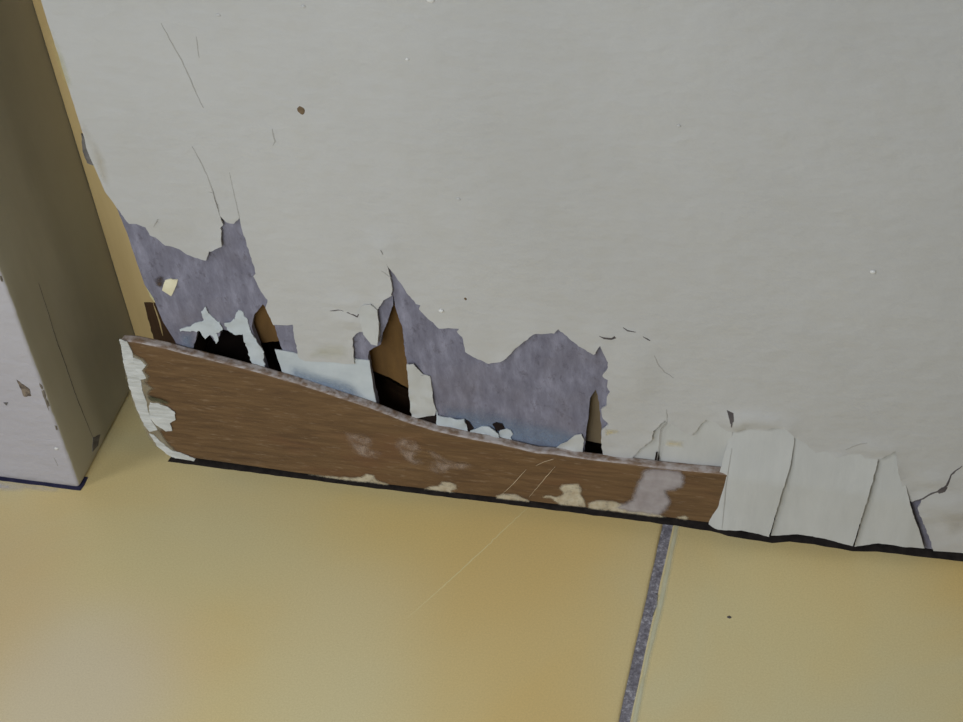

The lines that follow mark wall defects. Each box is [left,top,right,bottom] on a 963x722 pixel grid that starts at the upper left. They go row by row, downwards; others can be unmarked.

peeling [117,209,610,461]
crack [912,466,962,503]